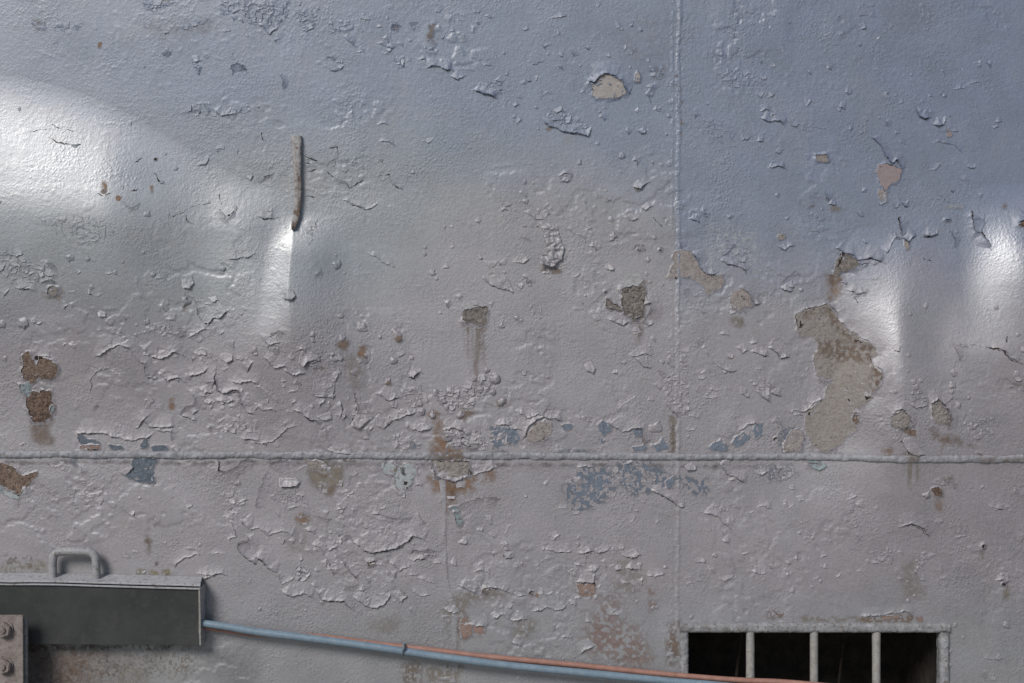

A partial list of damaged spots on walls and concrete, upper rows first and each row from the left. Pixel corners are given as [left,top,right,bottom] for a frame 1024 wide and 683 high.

spalling [138,0,665,146]
spalling [16,341,78,427]
peeling [41,199,995,632]
spalling [0,461,39,500]
corrosion [430,478,475,502]